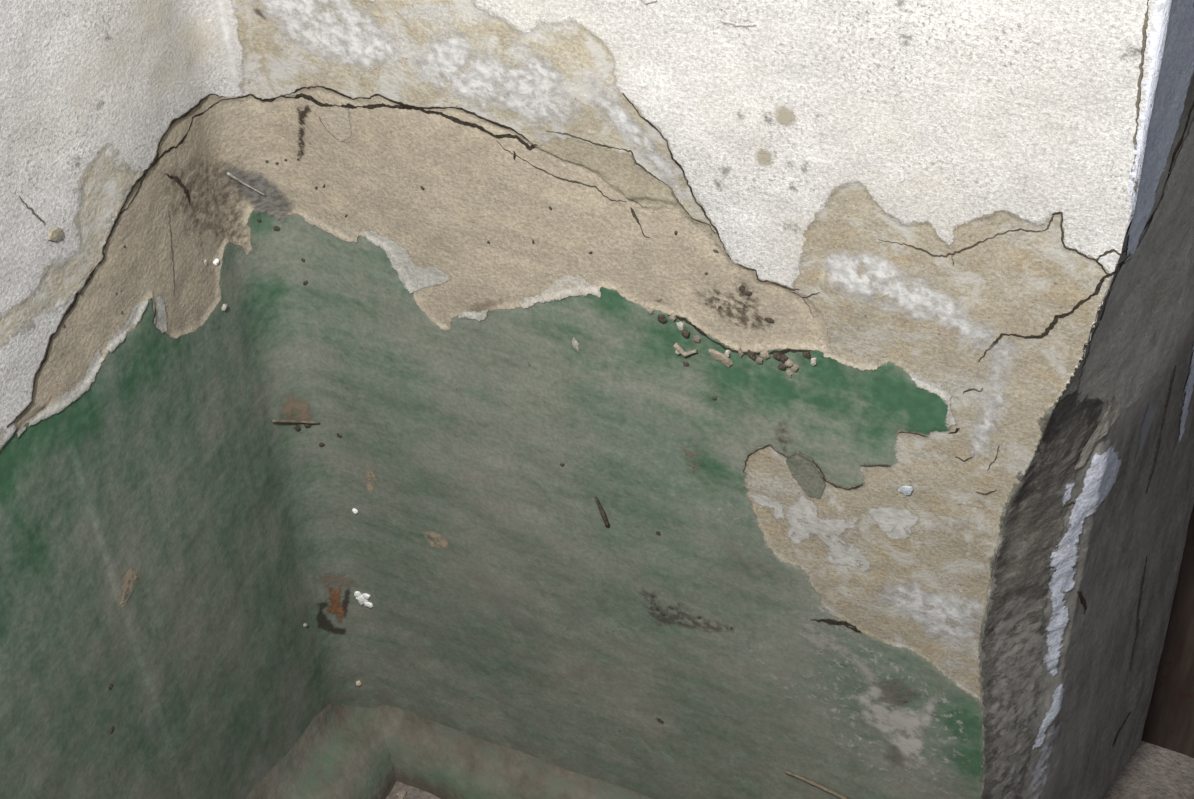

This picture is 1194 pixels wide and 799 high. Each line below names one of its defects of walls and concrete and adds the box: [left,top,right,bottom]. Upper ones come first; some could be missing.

crack [6,86,820,428]
spalling [0,85,830,437]
peeling [231,0,714,237]
crack [878,1,1194,393]
rust [317,573,356,634]
peeling [354,591,373,608]
crack [743,444,891,490]
peeling [744,182,1122,799]
crack [898,428,1000,495]